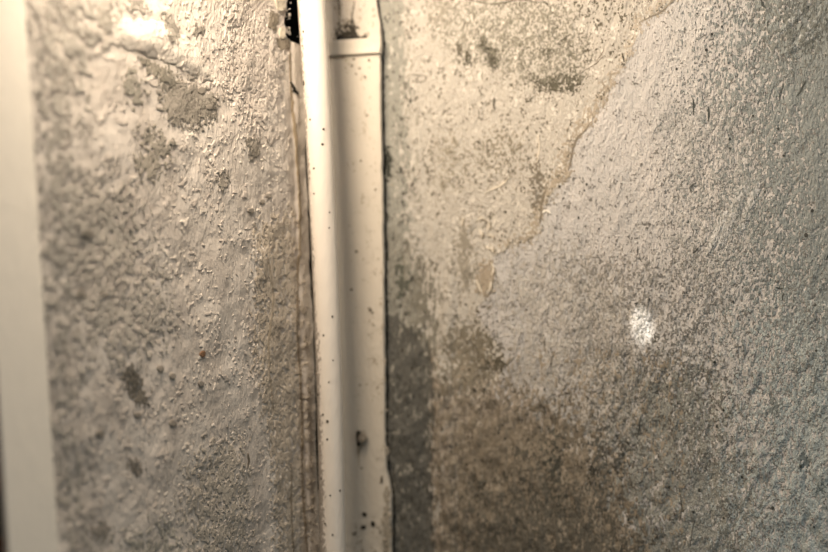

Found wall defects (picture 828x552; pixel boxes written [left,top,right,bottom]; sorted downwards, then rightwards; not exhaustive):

peeling [387,0,675,552]
leakage [379,0,828,552]